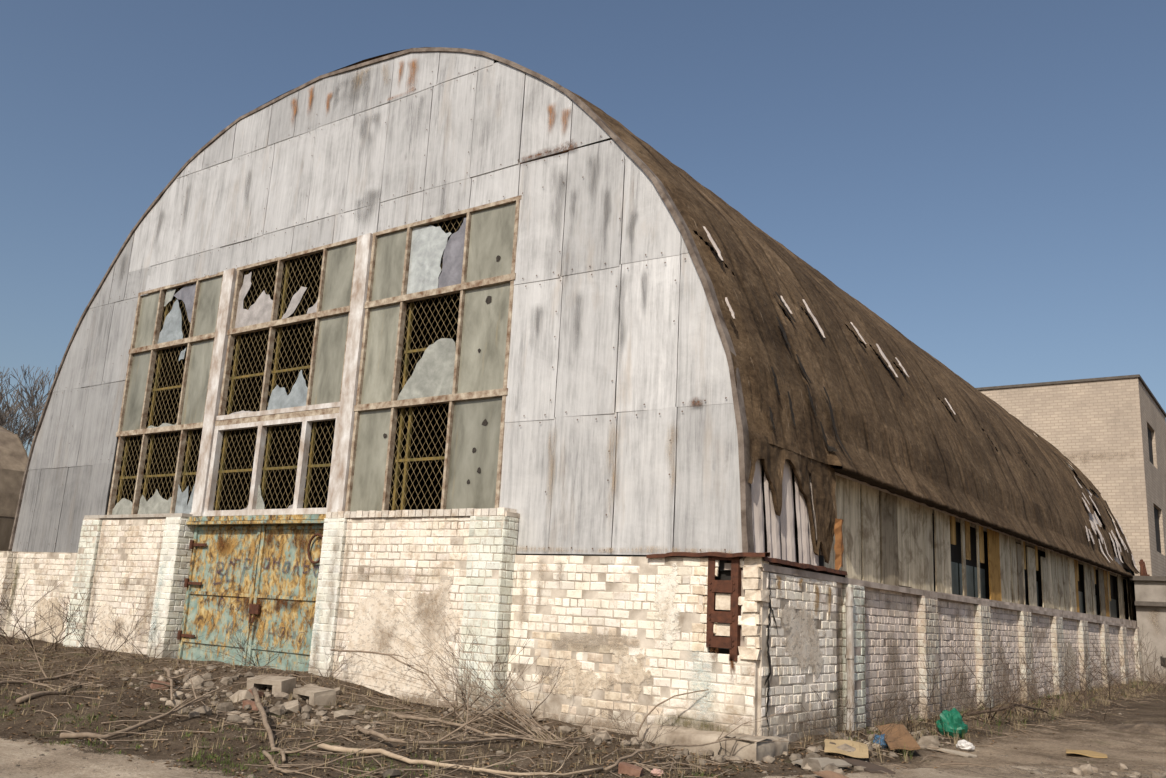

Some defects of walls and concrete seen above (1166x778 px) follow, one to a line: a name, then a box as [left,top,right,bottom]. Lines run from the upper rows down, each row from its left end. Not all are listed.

corrosion [216,538,237,555]
corrosion [232,597,264,645]
corrosion [250,535,309,640]
crack [764,572,778,735]